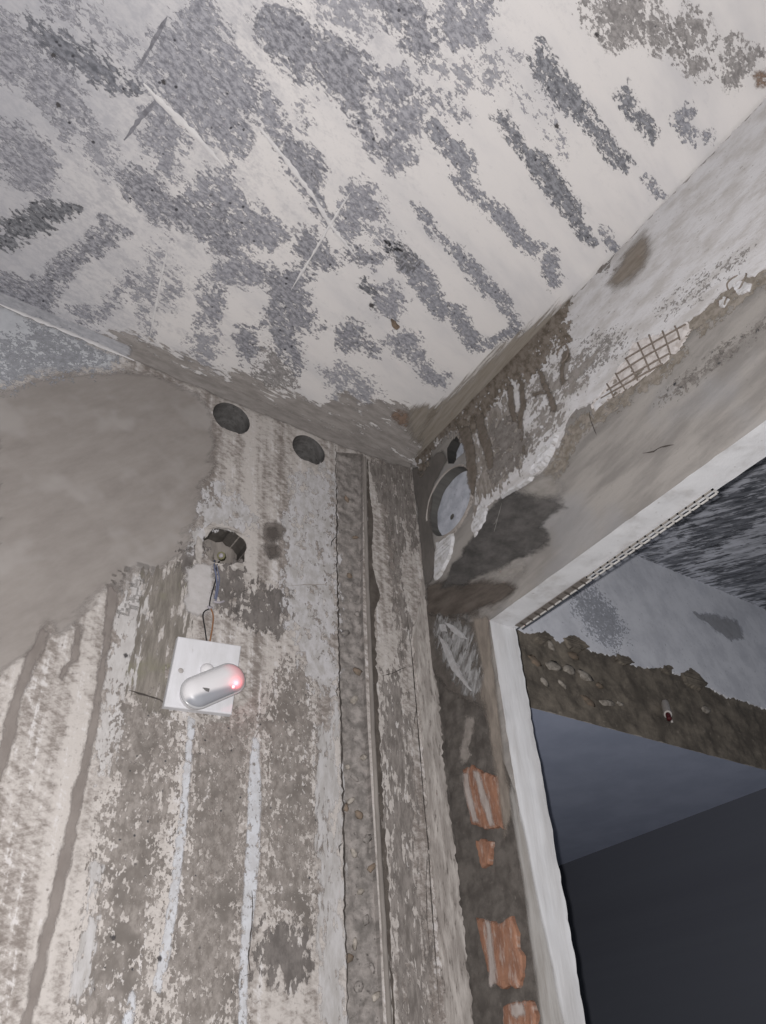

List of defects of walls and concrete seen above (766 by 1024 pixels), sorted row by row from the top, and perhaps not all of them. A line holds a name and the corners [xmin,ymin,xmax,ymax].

crack [124,96,160,141]
crack [138,17,167,69]
peeling [0,0,766,537]
damp [597,238,648,286]
damp [412,299,599,710]
peeling [412,524,540,1024]